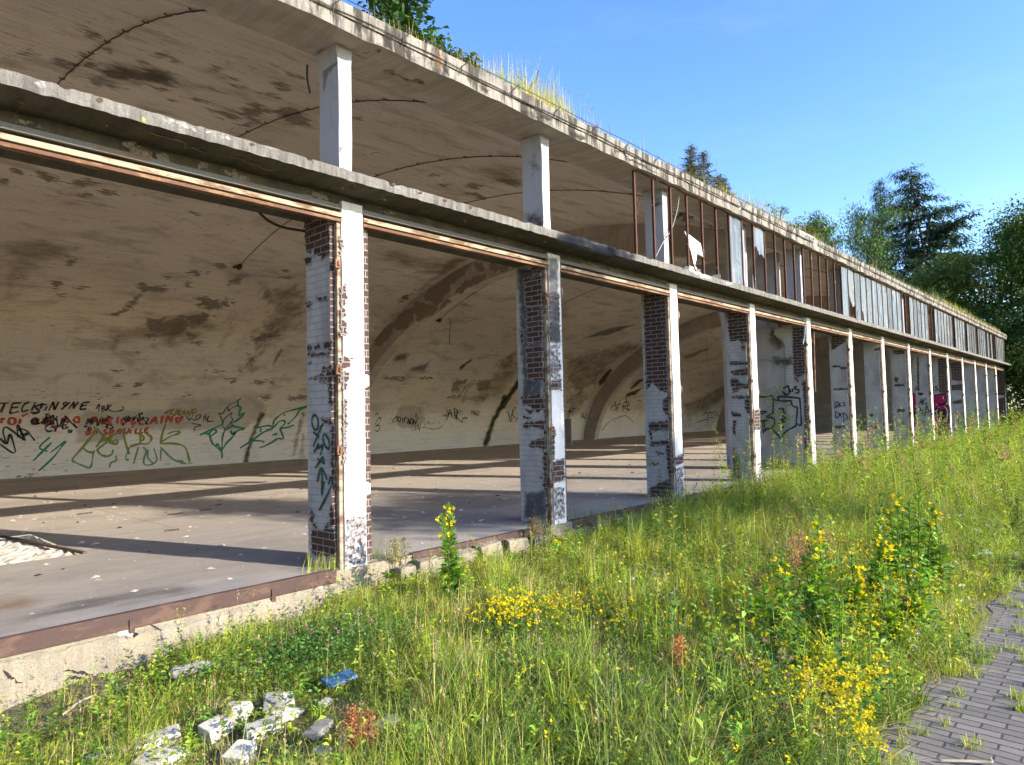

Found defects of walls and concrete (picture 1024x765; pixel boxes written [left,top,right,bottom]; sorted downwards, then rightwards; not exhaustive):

water stain [84,62,172,93]
water stain [145,296,233,344]
peeling [303,219,345,267]
peeling [305,284,367,567]
peeling [519,259,566,521]
peeling [643,293,684,501]
peeling [727,312,761,477]